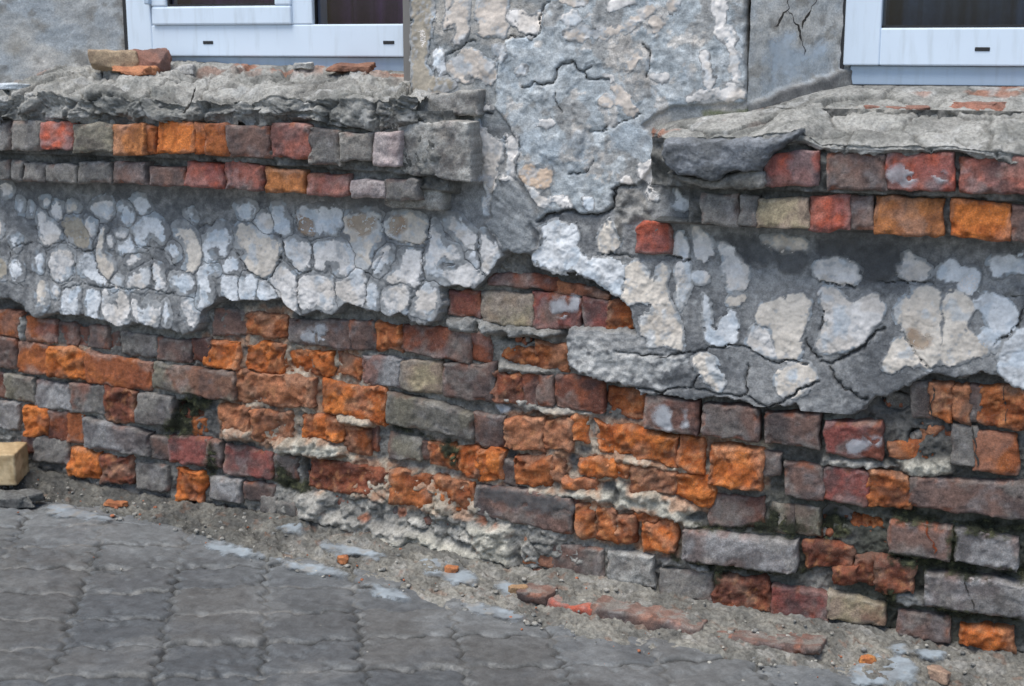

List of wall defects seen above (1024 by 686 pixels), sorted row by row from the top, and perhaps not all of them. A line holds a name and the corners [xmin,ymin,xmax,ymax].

crack [775,0,817,54]
crack [521,61,610,108]
peeling [0,0,1024,531]
crack [634,311,885,408]
spalling [574,502,681,554]
spalling [801,514,918,595]
spalling [710,571,772,612]
spalling [958,620,1017,654]